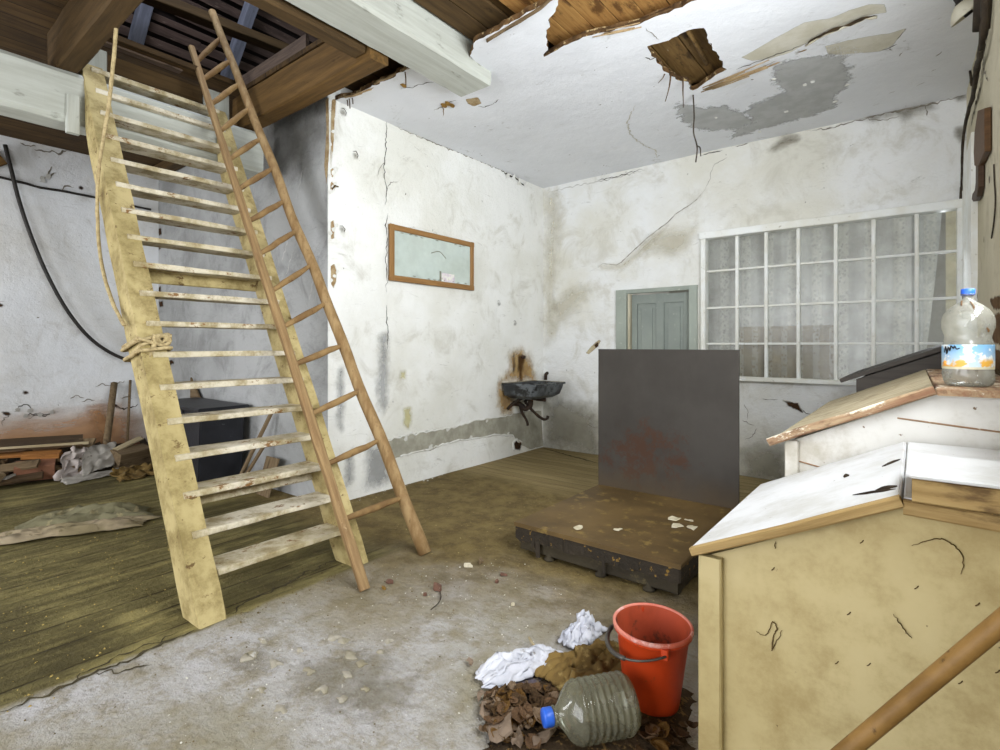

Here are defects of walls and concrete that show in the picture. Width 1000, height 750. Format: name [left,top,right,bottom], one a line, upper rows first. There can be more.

peeling [414,0,906,138]
crack [377,126,528,352]
spalling [388,411,543,458]
corrosion [499,351,534,412]